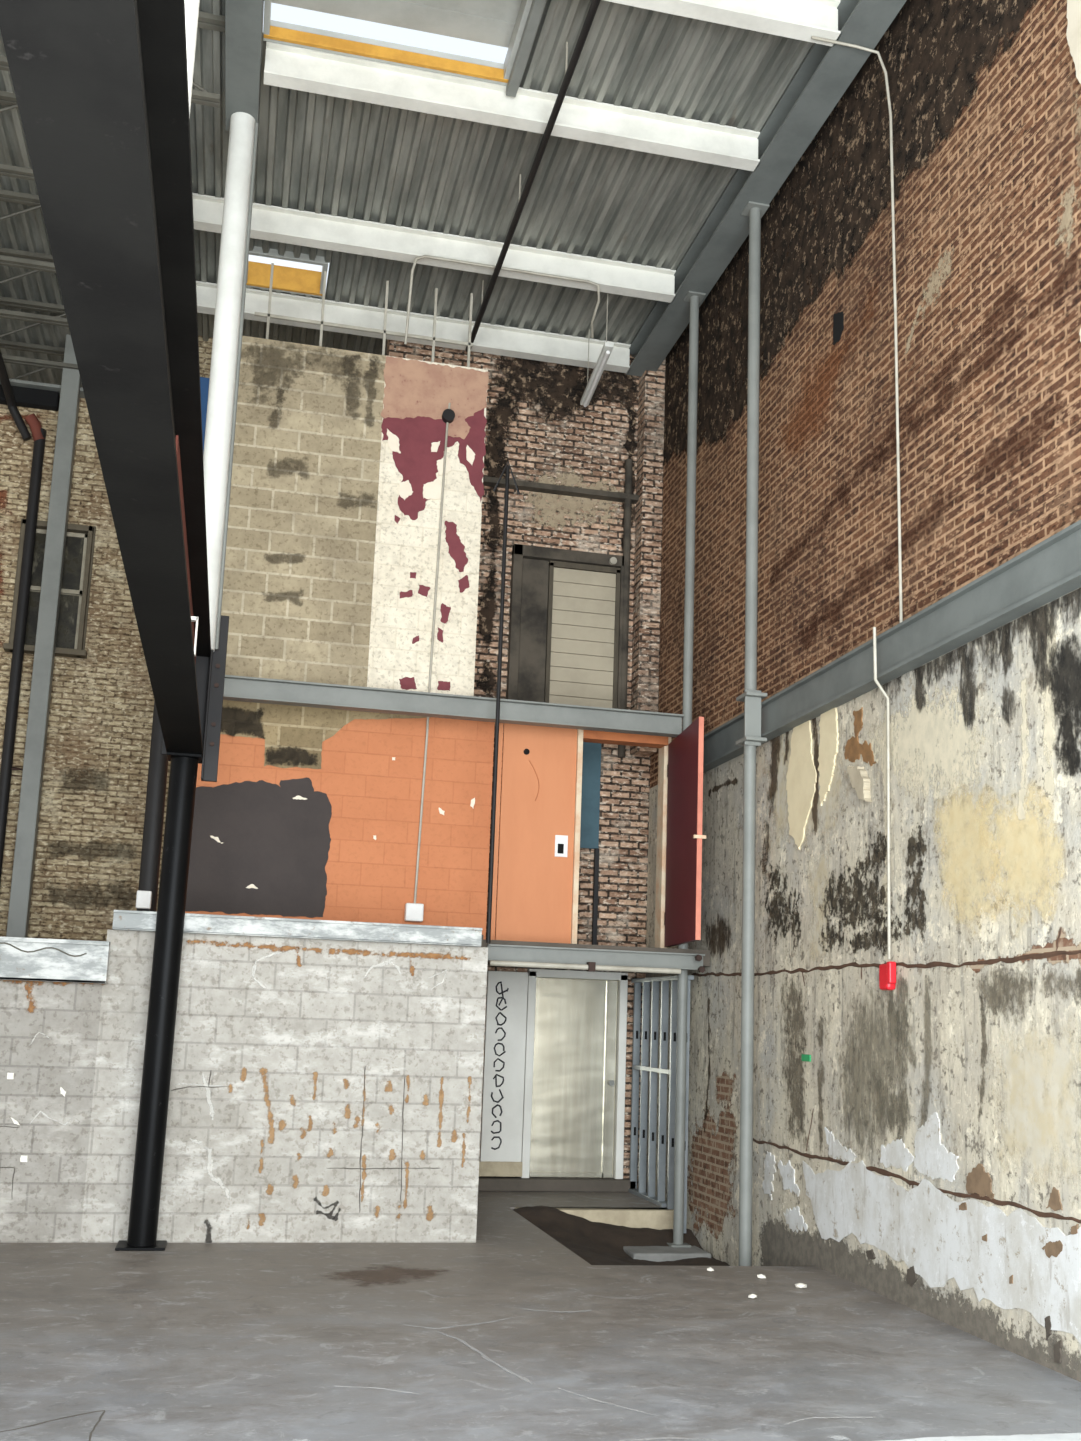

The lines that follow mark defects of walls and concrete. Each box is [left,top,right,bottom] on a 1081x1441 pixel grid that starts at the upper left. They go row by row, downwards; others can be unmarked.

flaking render [1066,0,1081,84]
peeling [381,356,489,524]
leakage [770,182,1078,583]
peeling [400,572,451,643]
peeling [444,521,470,593]
leakage [802,489,951,650]
leakage [762,607,1081,959]
crack [691,927,1081,986]
corrosion [228,1068,318,1195]
corrosion [327,1075,472,1219]
peeling [762,1112,1081,1363]
crack [0,1410,105,1441]